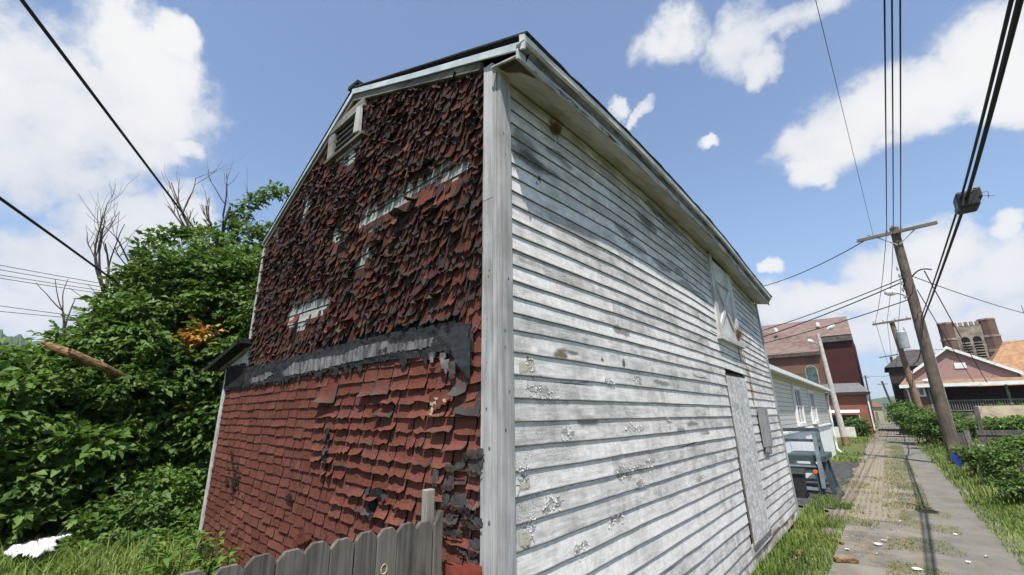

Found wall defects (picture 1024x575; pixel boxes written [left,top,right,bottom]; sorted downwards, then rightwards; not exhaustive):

peeling [328,139,476,279]
peeling [286,287,331,331]
peeling [525,356,553,400]
peeling [616,458,656,491]
peeling [526,494,564,536]
peeling [574,540,589,561]